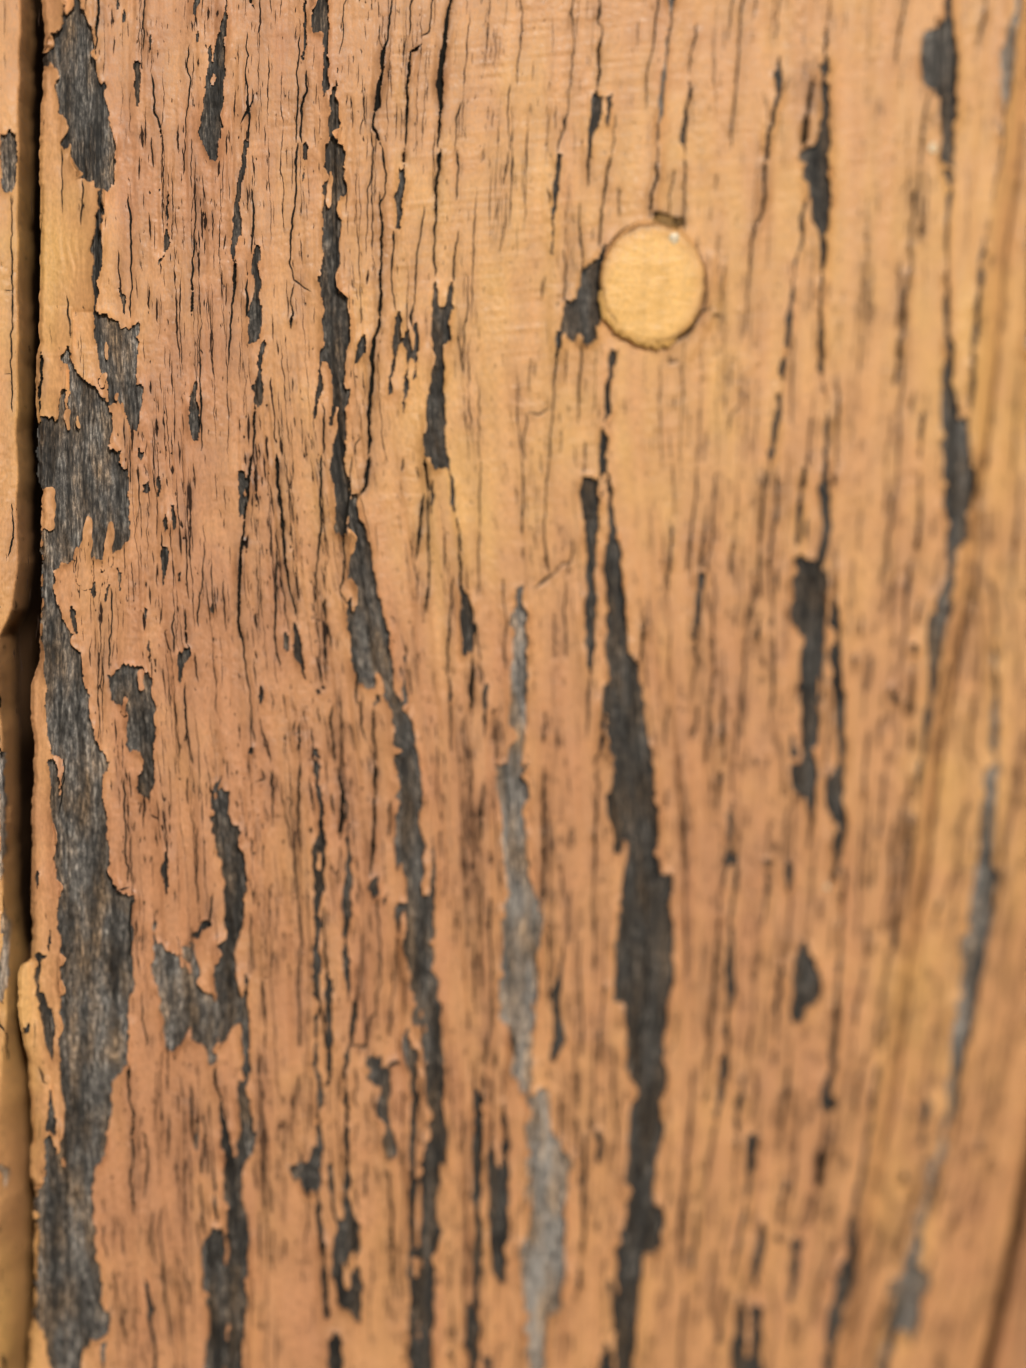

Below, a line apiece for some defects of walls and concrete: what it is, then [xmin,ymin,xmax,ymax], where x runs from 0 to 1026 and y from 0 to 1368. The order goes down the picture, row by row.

peeling [23,0,181,1368]
peeling [151,776,257,1368]
peeling [187,0,228,161]
peeling [230,139,249,262]
peeling [247,245,266,407]
peeling [283,0,606,1368]
peeling [586,91,613,166]
peeling [579,349,675,1368]
peeling [714,801,804,1368]
peeling [767,7,859,1113]
peeling [877,633,1001,1368]
peeling [911,0,989,798]